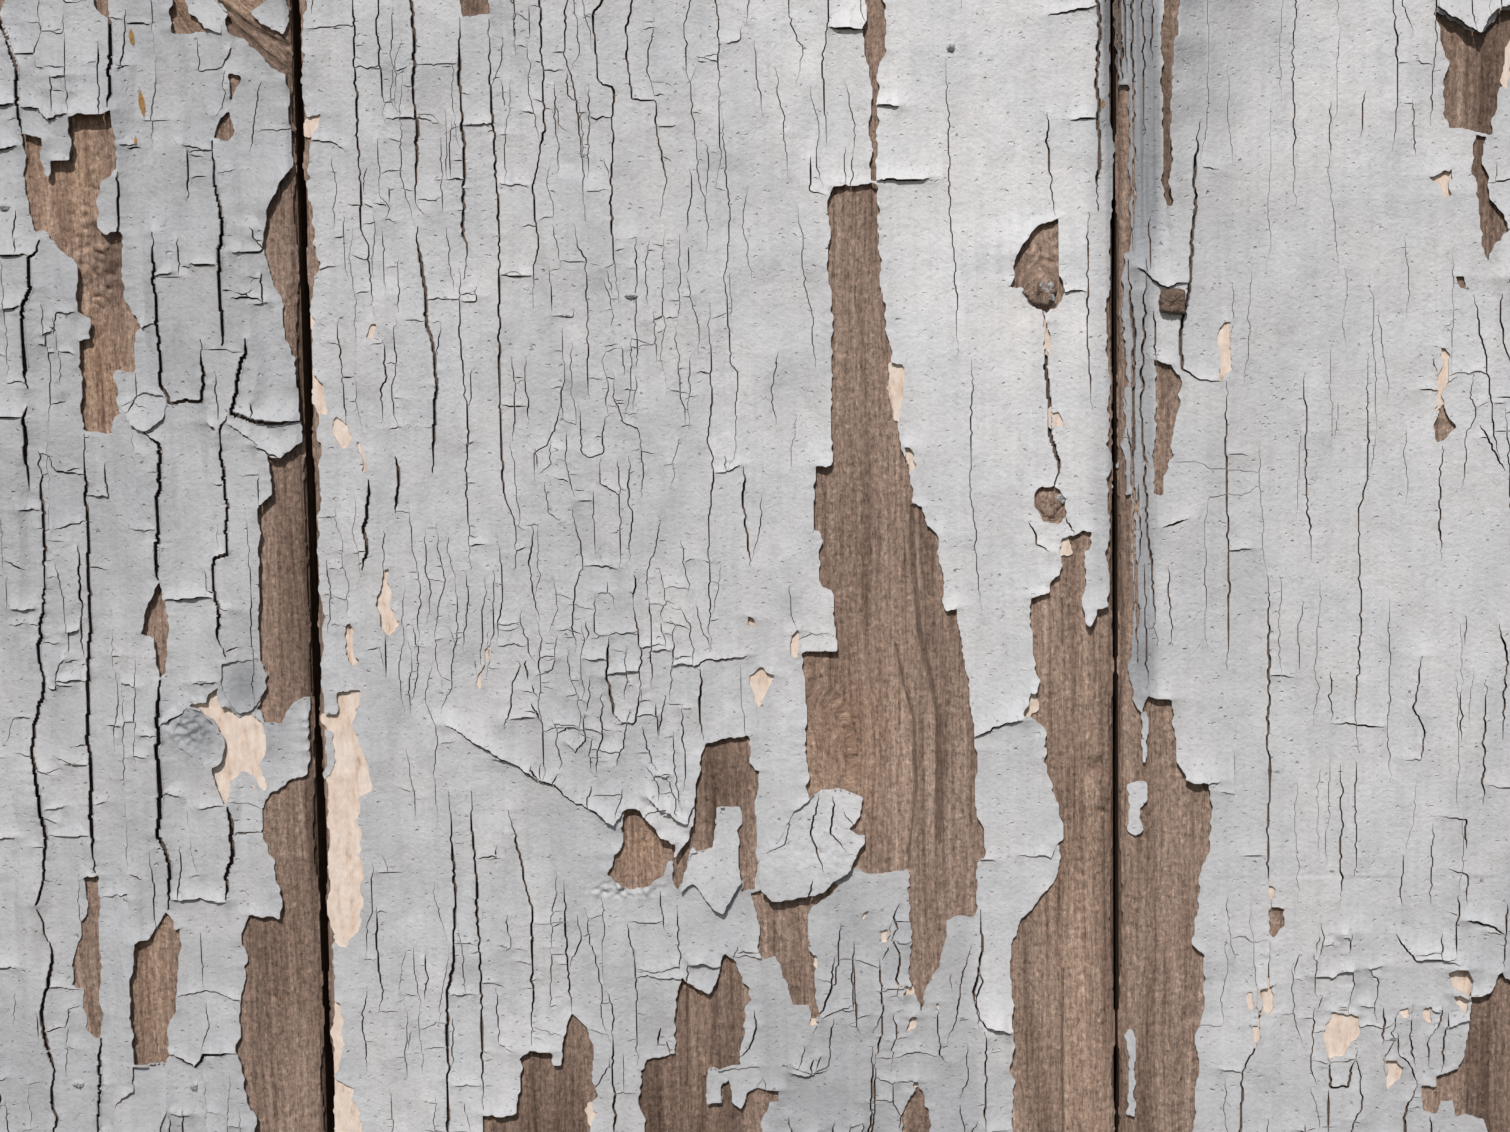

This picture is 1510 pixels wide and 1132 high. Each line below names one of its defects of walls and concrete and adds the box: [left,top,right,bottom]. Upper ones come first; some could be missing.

peeling [1434,0,1510,259]
peeling [21,108,166,438]
peeling [608,0,986,1018]
crack [1029,523,1072,551]
peeling [1010,77,1213,1132]
crack [1043,0,1510,964]
peeling [221,404,335,1132]
peeling [483,1014,601,1132]
peeling [638,952,779,1132]
crack [1059,969,1067,1132]
crack [1220,899,1449,1132]
peeling [1413,965,1510,1132]